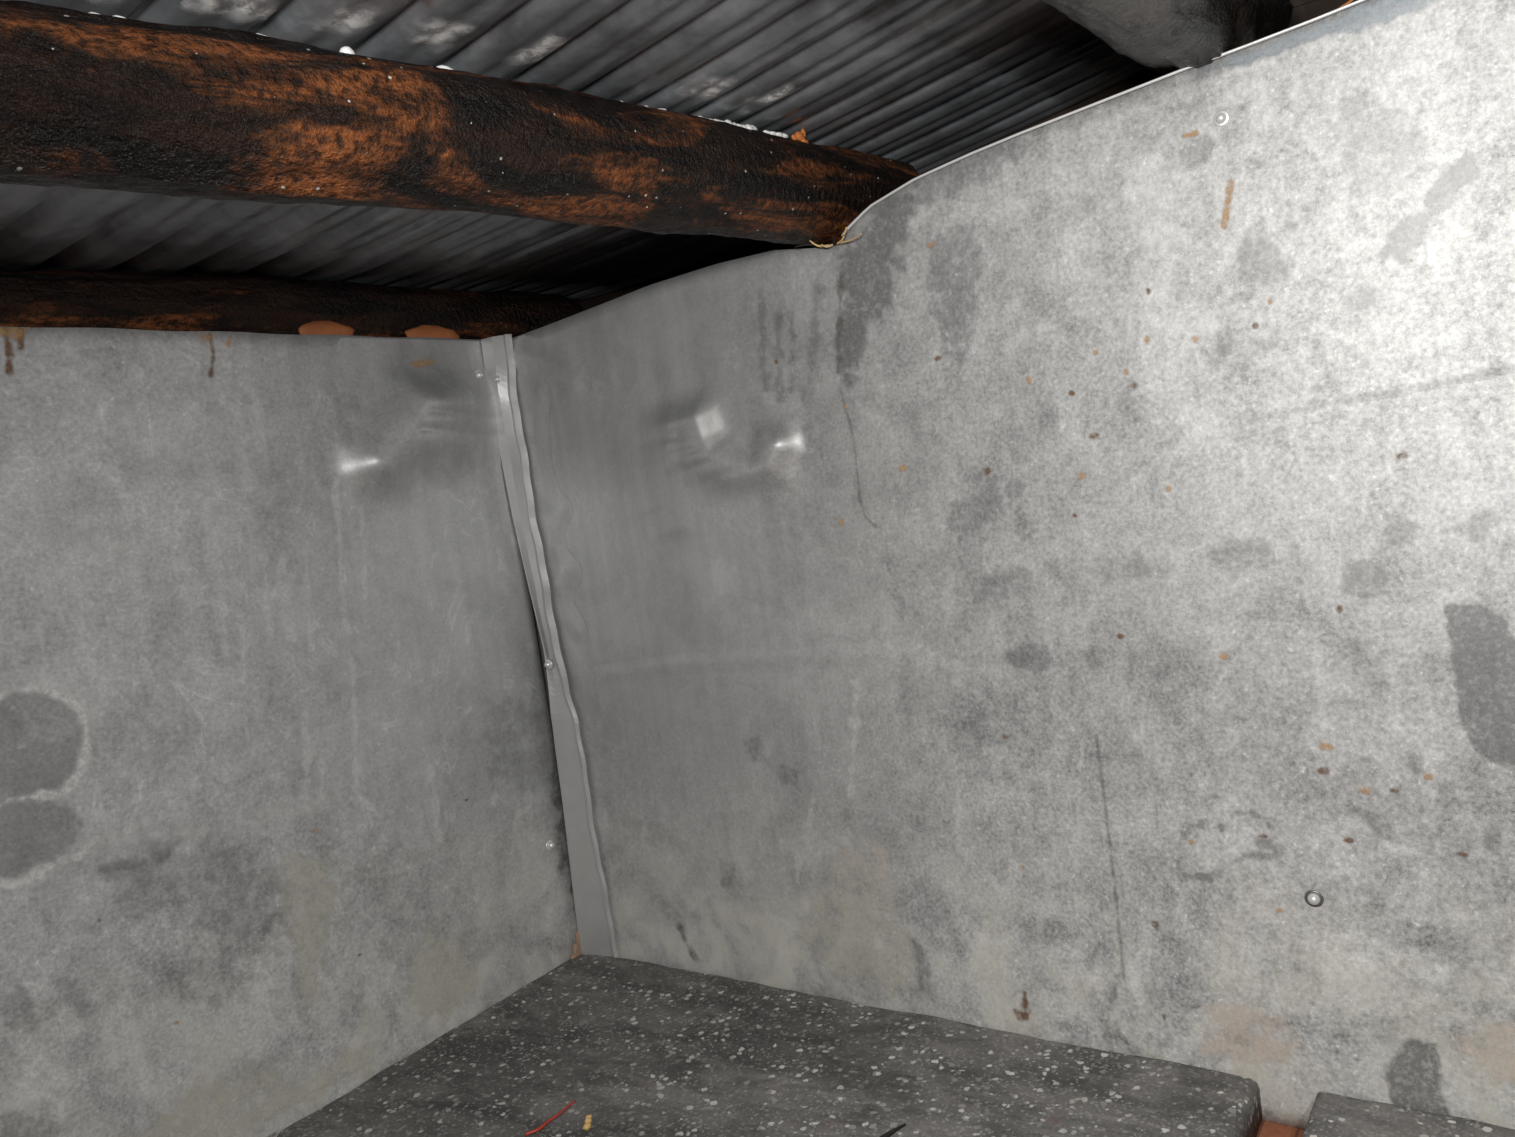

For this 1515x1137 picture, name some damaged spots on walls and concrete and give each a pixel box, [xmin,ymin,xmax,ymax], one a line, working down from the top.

rust [0,327,24,374]
leakage [1446,605,1515,764]
leakage [6,685,90,802]
leakage [0,864,53,890]